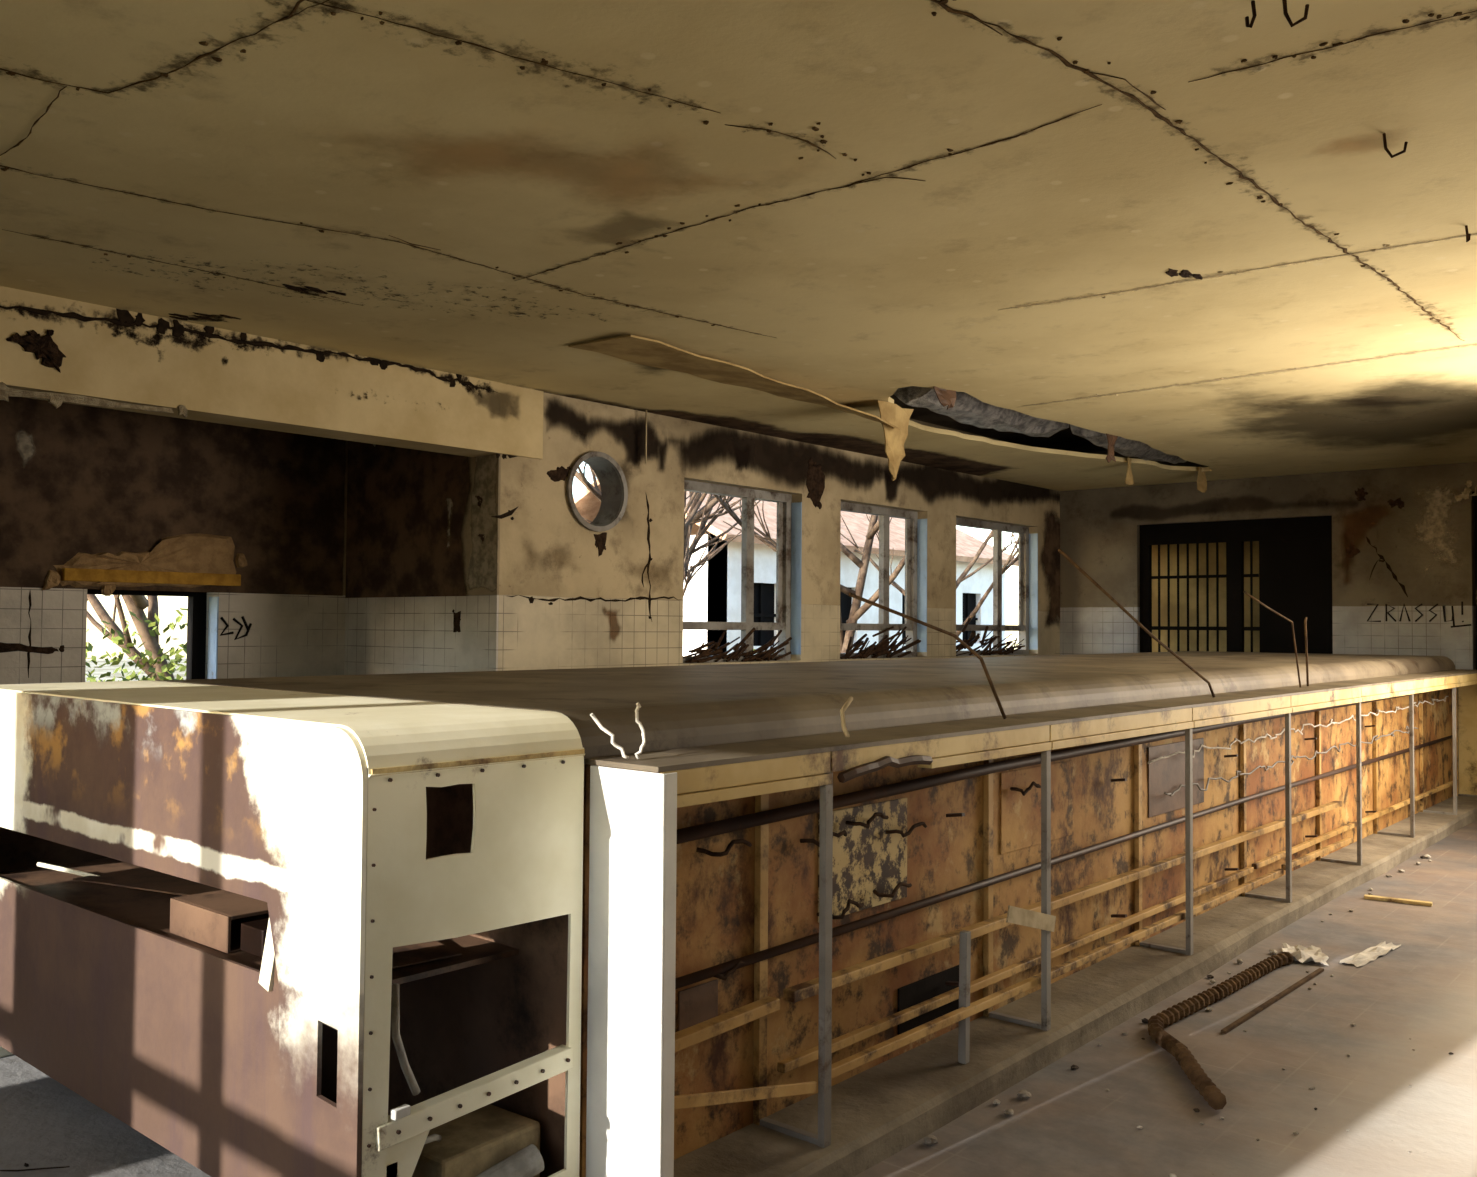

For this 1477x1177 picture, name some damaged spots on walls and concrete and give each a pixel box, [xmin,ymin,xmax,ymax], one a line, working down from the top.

crack [0,0,1477,407]
leakage [93,252,572,319]
spalling [6,330,66,373]
crack [496,452,517,460]
leakage [635,430,667,470]
leakage [736,447,750,469]
leakage [885,473,899,501]
peeling [468,454,498,591]
peeling [1387,480,1477,562]
spalling [42,533,247,596]